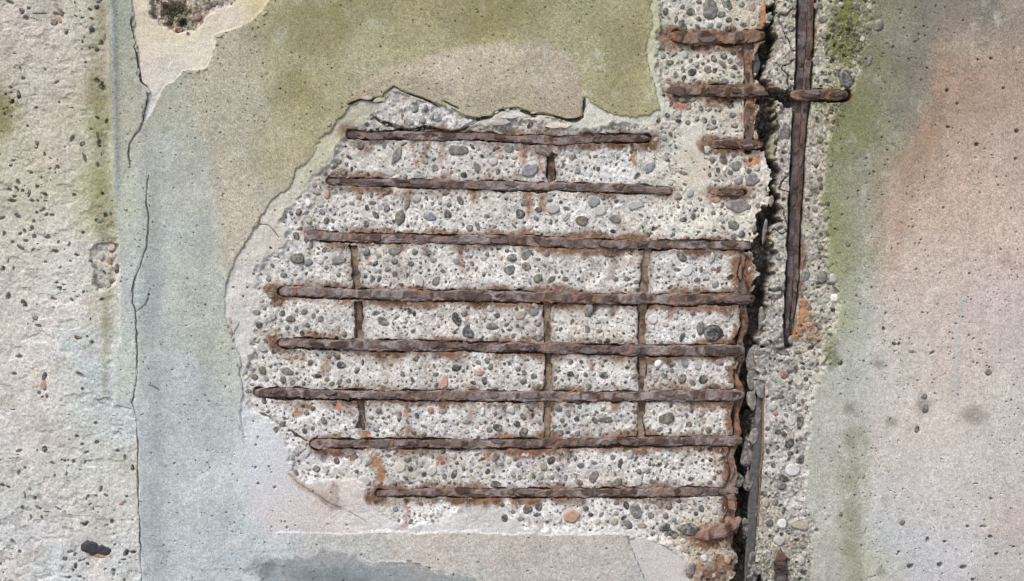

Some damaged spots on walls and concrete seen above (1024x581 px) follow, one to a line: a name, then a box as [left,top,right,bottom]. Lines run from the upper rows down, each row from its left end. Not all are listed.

peeling [130,0,269,122]
rust [657,1,766,64]
rust [539,129,660,174]
rust [664,81,774,166]
rust [336,170,446,199]
rust [707,184,749,200]
rust [356,227,670,266]
crack [127,15,159,581]
rust [264,283,312,305]
spalling [223,0,883,581]
rust [267,331,340,372]
rust [313,236,755,581]